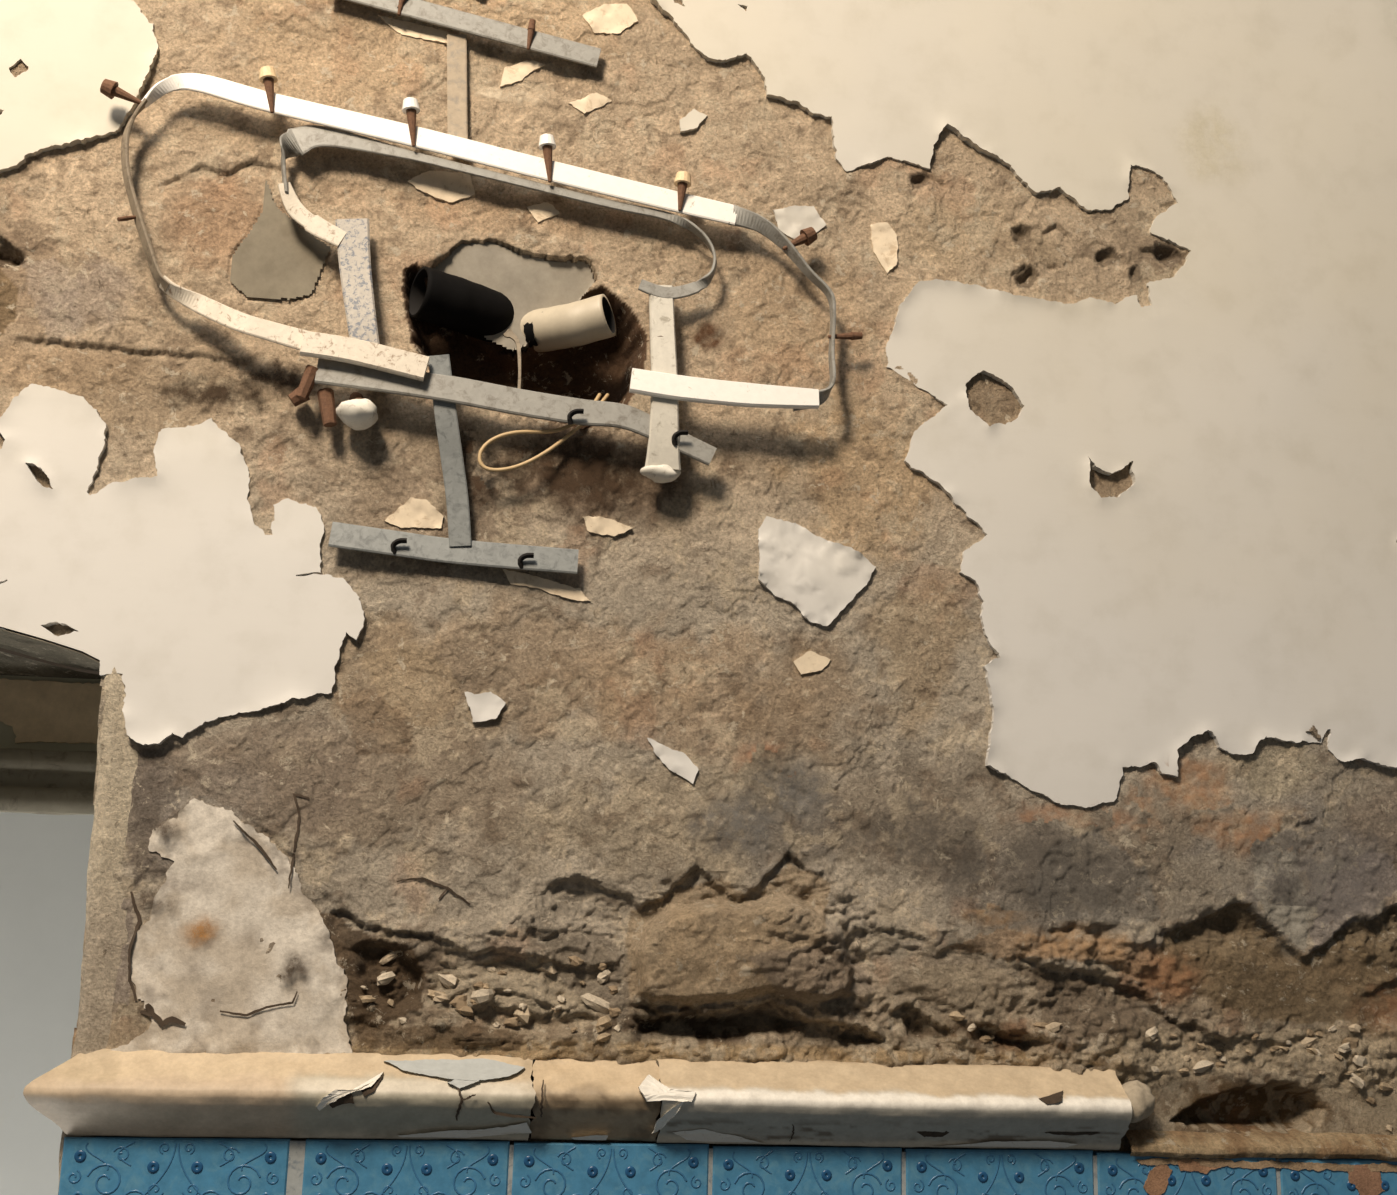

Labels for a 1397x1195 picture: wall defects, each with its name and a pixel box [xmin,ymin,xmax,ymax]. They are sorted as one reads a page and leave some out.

peeling [133,0,453,134]
peeling [773,205,827,241]
spalling [400,259,518,388]
spalling [521,282,651,414]
flaking render [966,373,1022,426]
peeling [758,516,876,627]
crack [233,793,310,888]
crack [128,892,186,1027]
peeling [111,798,353,1054]
crack [220,991,298,1016]
spalling [334,849,1397,1135]
crack [455,1080,544,1121]